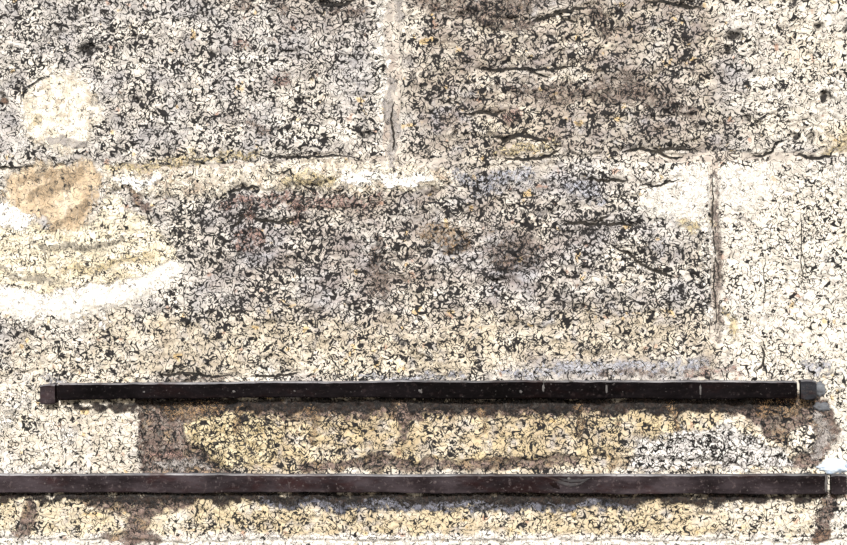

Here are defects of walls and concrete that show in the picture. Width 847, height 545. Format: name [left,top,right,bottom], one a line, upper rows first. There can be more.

crack [388,105,396,151]
crack [711,168,719,328]